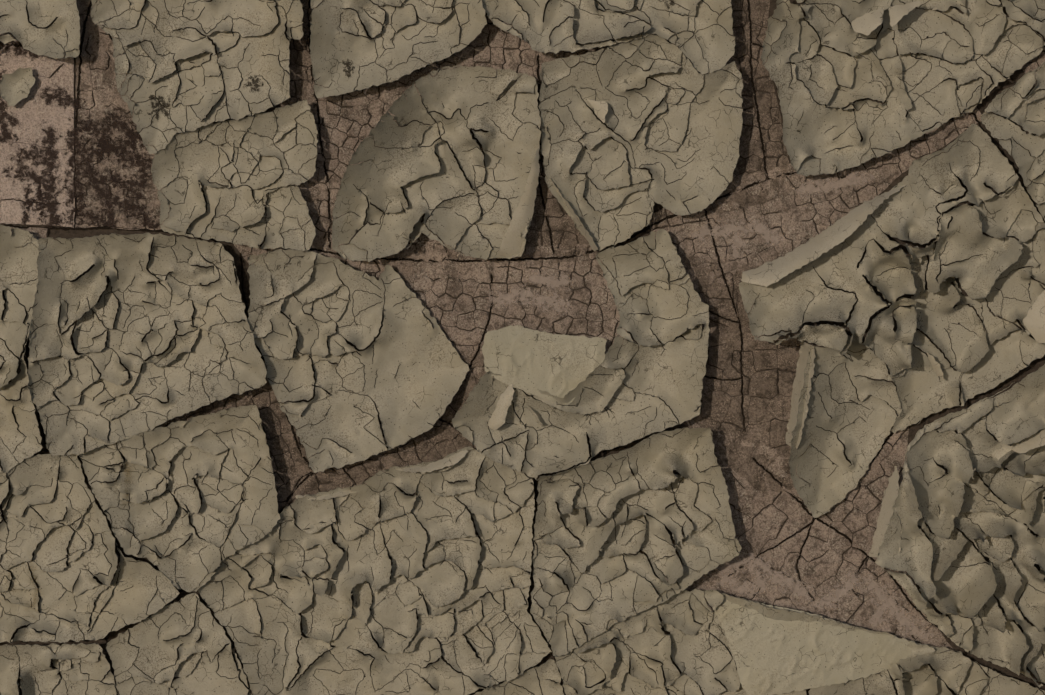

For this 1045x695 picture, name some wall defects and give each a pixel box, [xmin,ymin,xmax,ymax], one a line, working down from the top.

crack [921,76,1006,132]
peeling [806,153,882,188]
peeling [75,216,98,228]
crack [374,0,837,432]
peeling [652,208,666,223]
crack [0,0,353,560]
peeling [474,246,1045,695]
crack [868,432,894,467]
crack [482,450,551,616]
crack [704,458,1045,685]
crack [479,633,587,695]